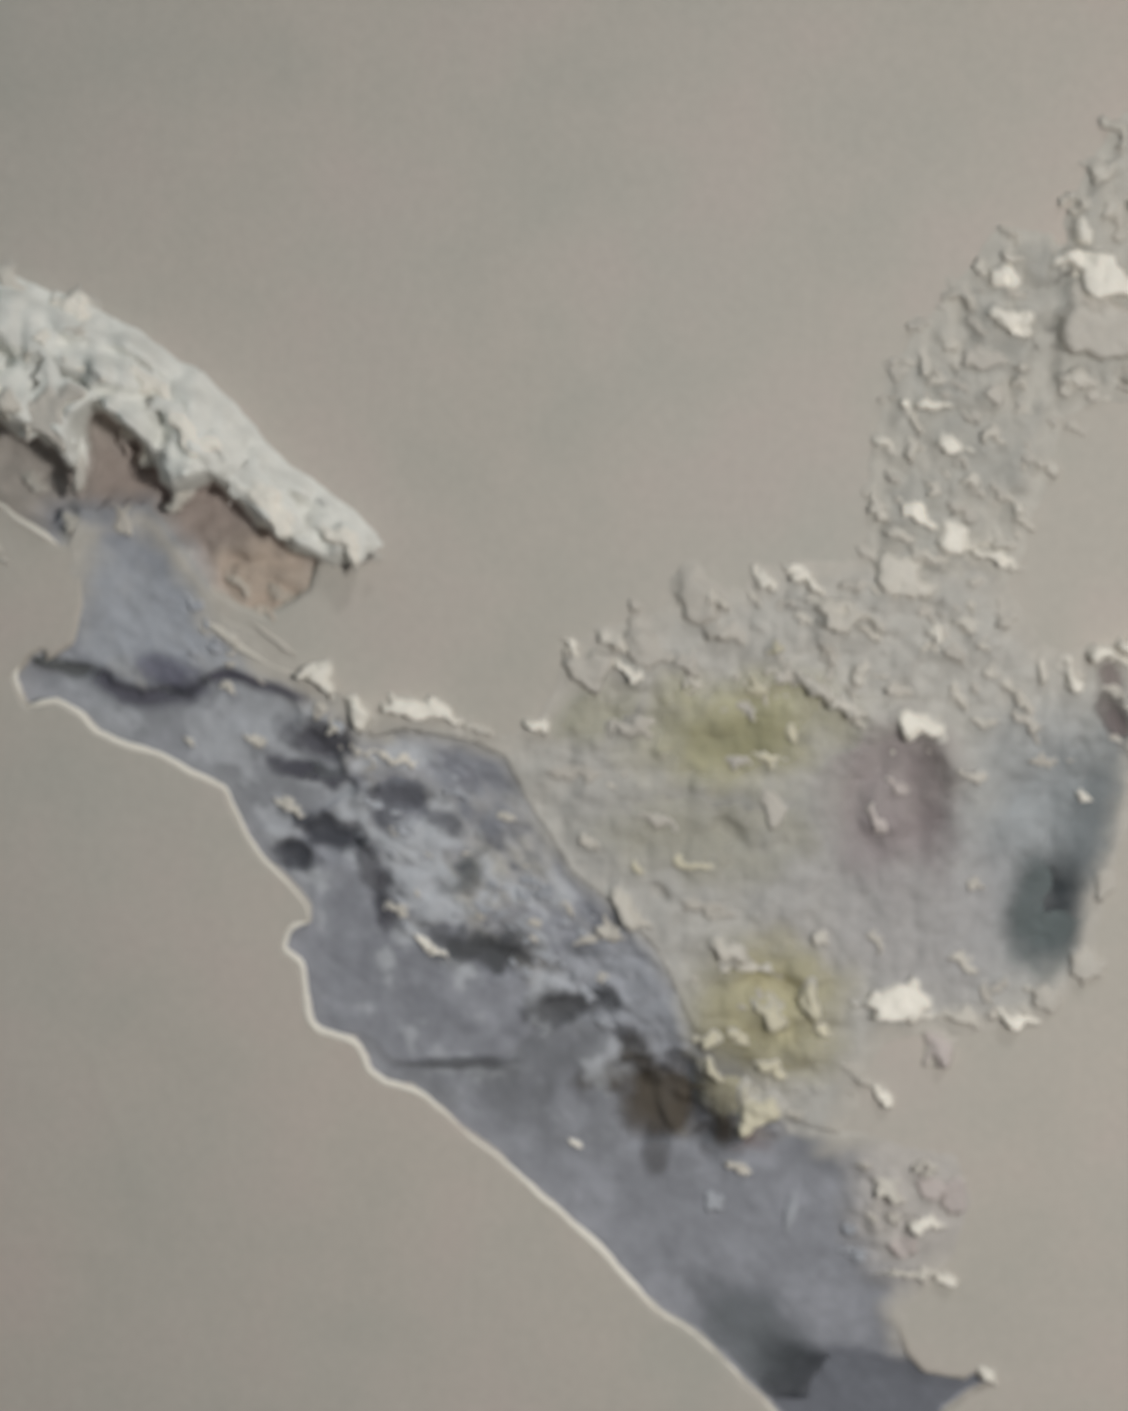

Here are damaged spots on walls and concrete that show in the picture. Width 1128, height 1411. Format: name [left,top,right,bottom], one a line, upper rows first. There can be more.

spalling [11,505,972,1411]
peeling [367,112,1128,1139]
spalling [938,1364,999,1411]